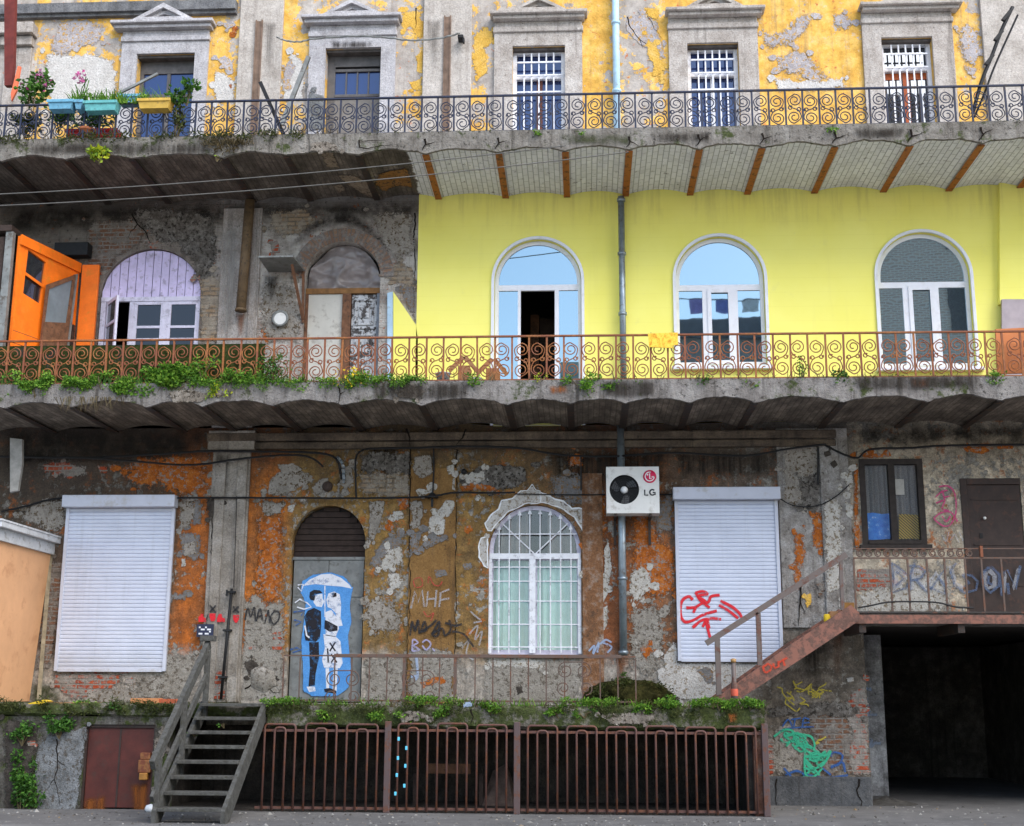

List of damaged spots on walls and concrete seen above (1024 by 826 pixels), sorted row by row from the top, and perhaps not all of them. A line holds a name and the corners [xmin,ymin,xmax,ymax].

peeling [34,19,121,114]
peeling [471,63,488,81]
flaking render [626,7,669,76]
peeling [758,9,860,93]
peeling [42,454,227,567]
flaking render [240,448,583,705]
peeling [602,486,612,630]
flaking render [623,495,757,706]
peeling [774,447,891,608]
peeling [363,642,464,723]
crack [46,739,68,804]